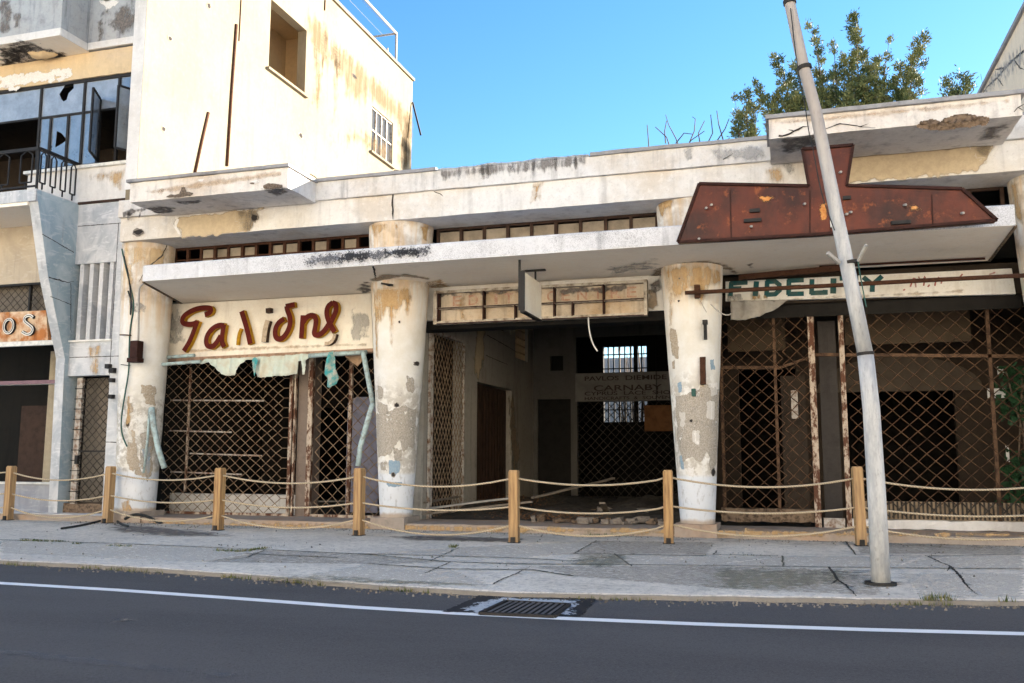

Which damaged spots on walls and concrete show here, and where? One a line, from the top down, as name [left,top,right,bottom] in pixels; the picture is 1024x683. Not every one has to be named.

peeling [0,41,73,91]
water stain [314,23,412,166]
spalling [917,113,989,131]
water stain [441,156,585,179]
peeling [670,328,679,369]
peeling [141,385,157,416]
peeling [376,386,416,470]
peeling [676,359,719,477]
peeling [126,430,154,481]